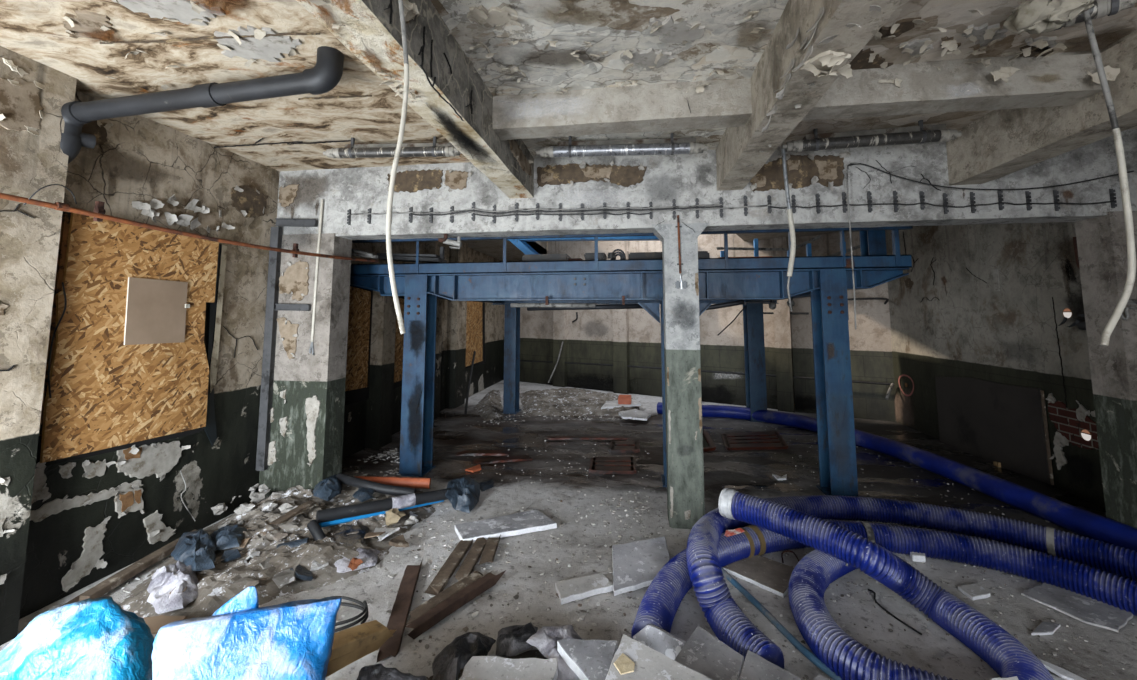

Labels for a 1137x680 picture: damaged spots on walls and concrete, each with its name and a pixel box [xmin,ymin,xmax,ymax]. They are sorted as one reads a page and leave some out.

peeling [570,0,721,87]
peeling [761,7,1067,133]
peeling [1087,65,1120,84]
peeling [131,184,299,234]
spalling [387,167,472,193]
spalling [508,140,647,187]
spalling [746,145,850,192]
peeling [267,389,288,465]
peeling [305,395,321,467]
peeling [30,441,191,592]
spalling [334,505,463,614]
spalling [452,471,691,635]